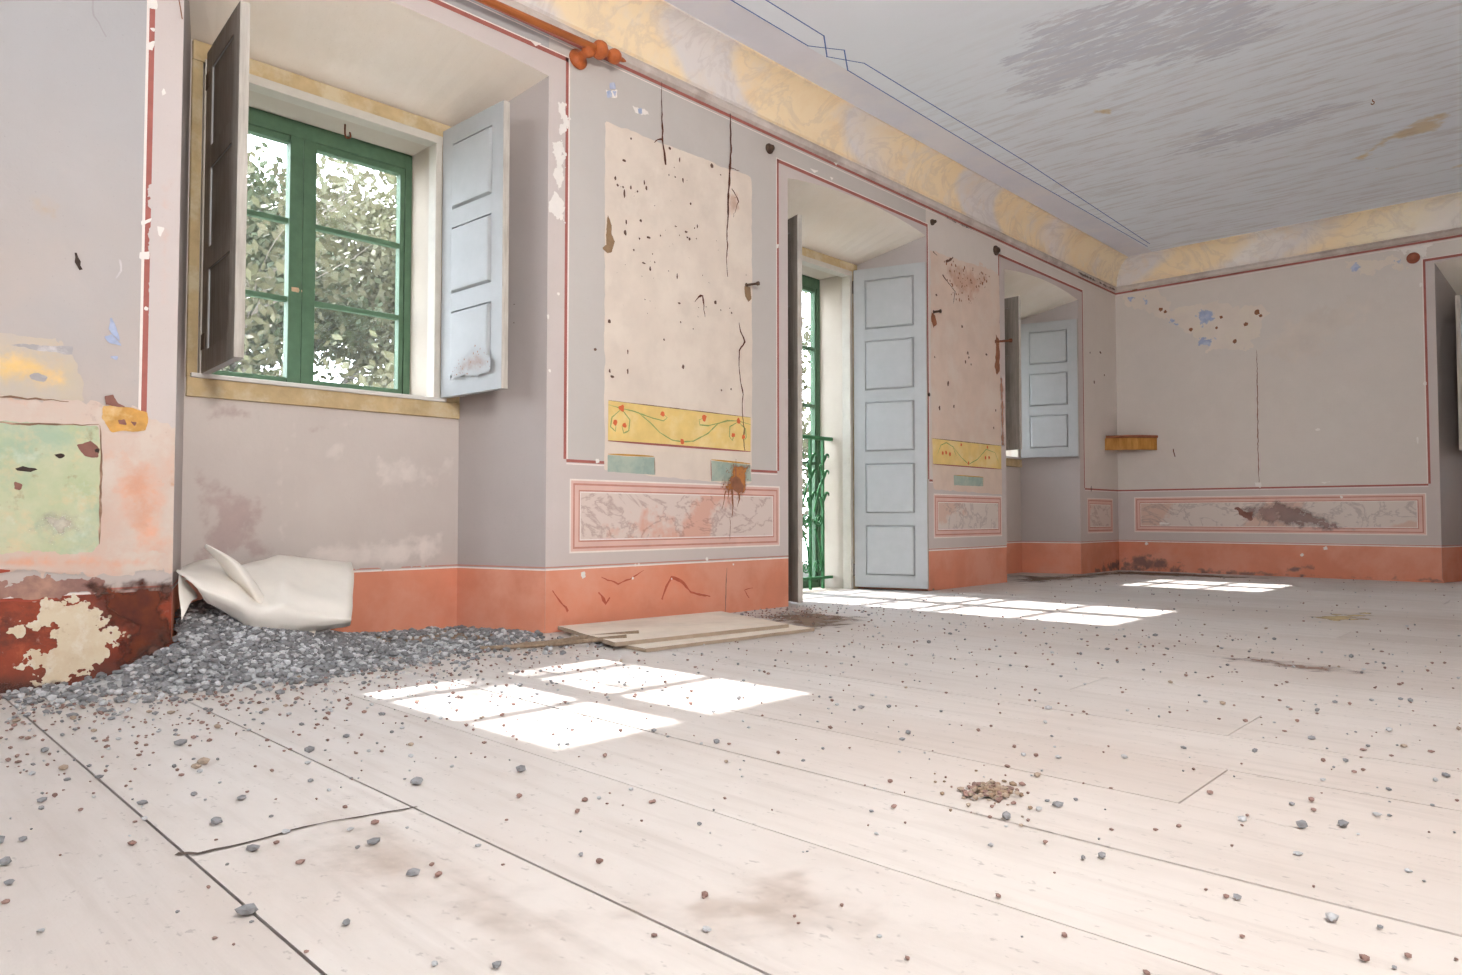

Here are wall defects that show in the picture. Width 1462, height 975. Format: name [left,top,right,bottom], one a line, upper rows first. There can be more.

crack [695,114,742,314]
peeling [29,373,47,382]
crack [738,324,746,450]
flaking render [1122,289,1270,353]
flaking render [0,395,175,687]
rust [722,464,748,534]